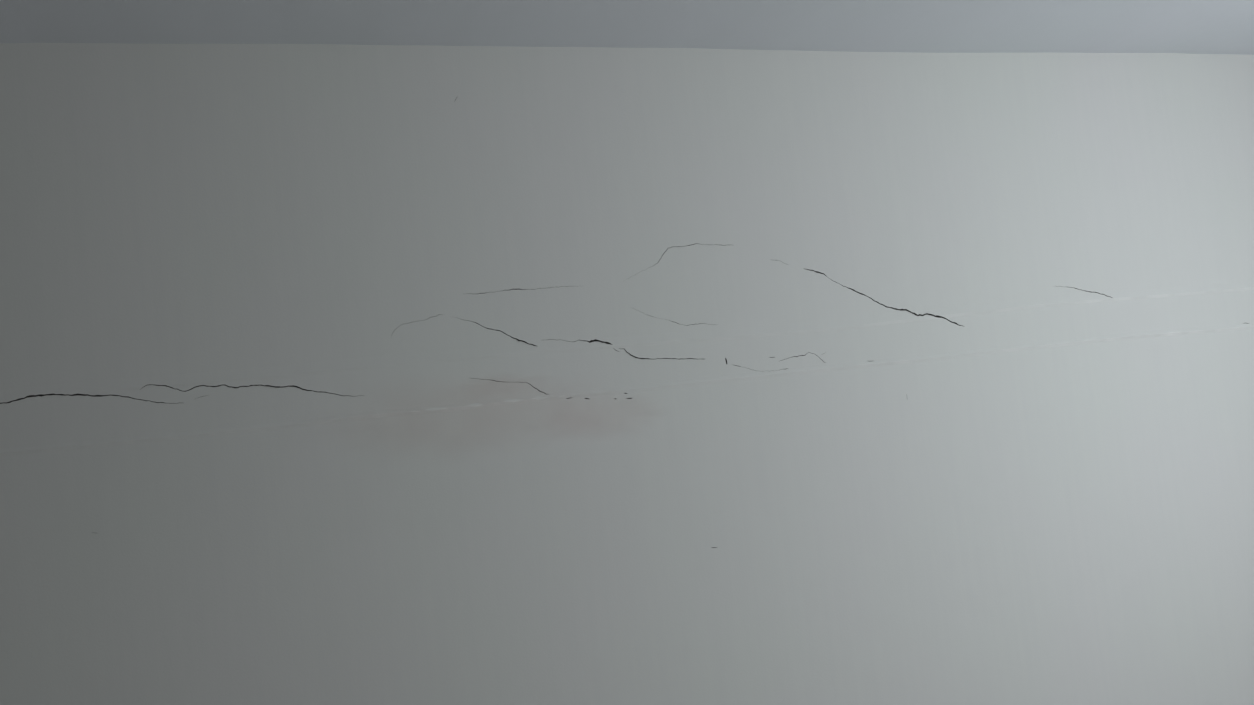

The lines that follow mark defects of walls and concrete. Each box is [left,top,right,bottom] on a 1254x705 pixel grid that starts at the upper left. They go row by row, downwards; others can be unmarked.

crack [391,286,693,360]
crack [778,260,965,327]
crack [0,384,364,405]